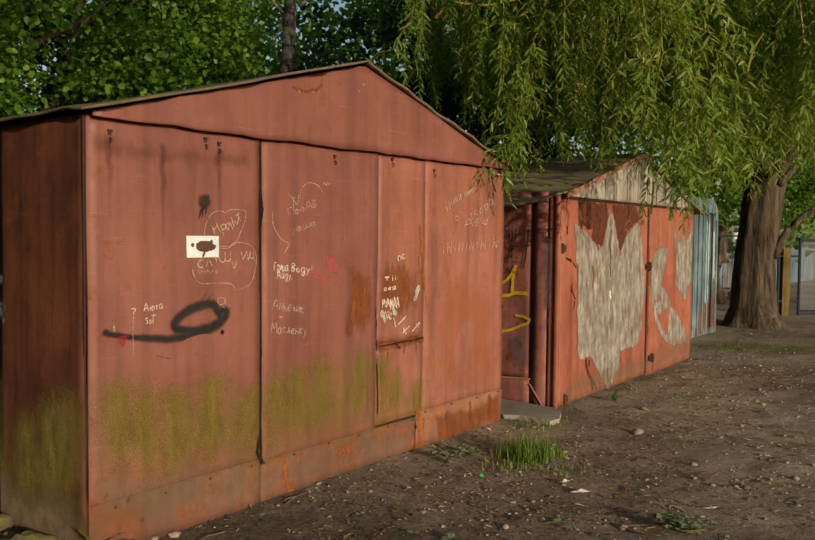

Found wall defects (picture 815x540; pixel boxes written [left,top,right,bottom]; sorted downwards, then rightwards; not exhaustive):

peeling [579,200,639,277]
corrosion [438,396,499,438]